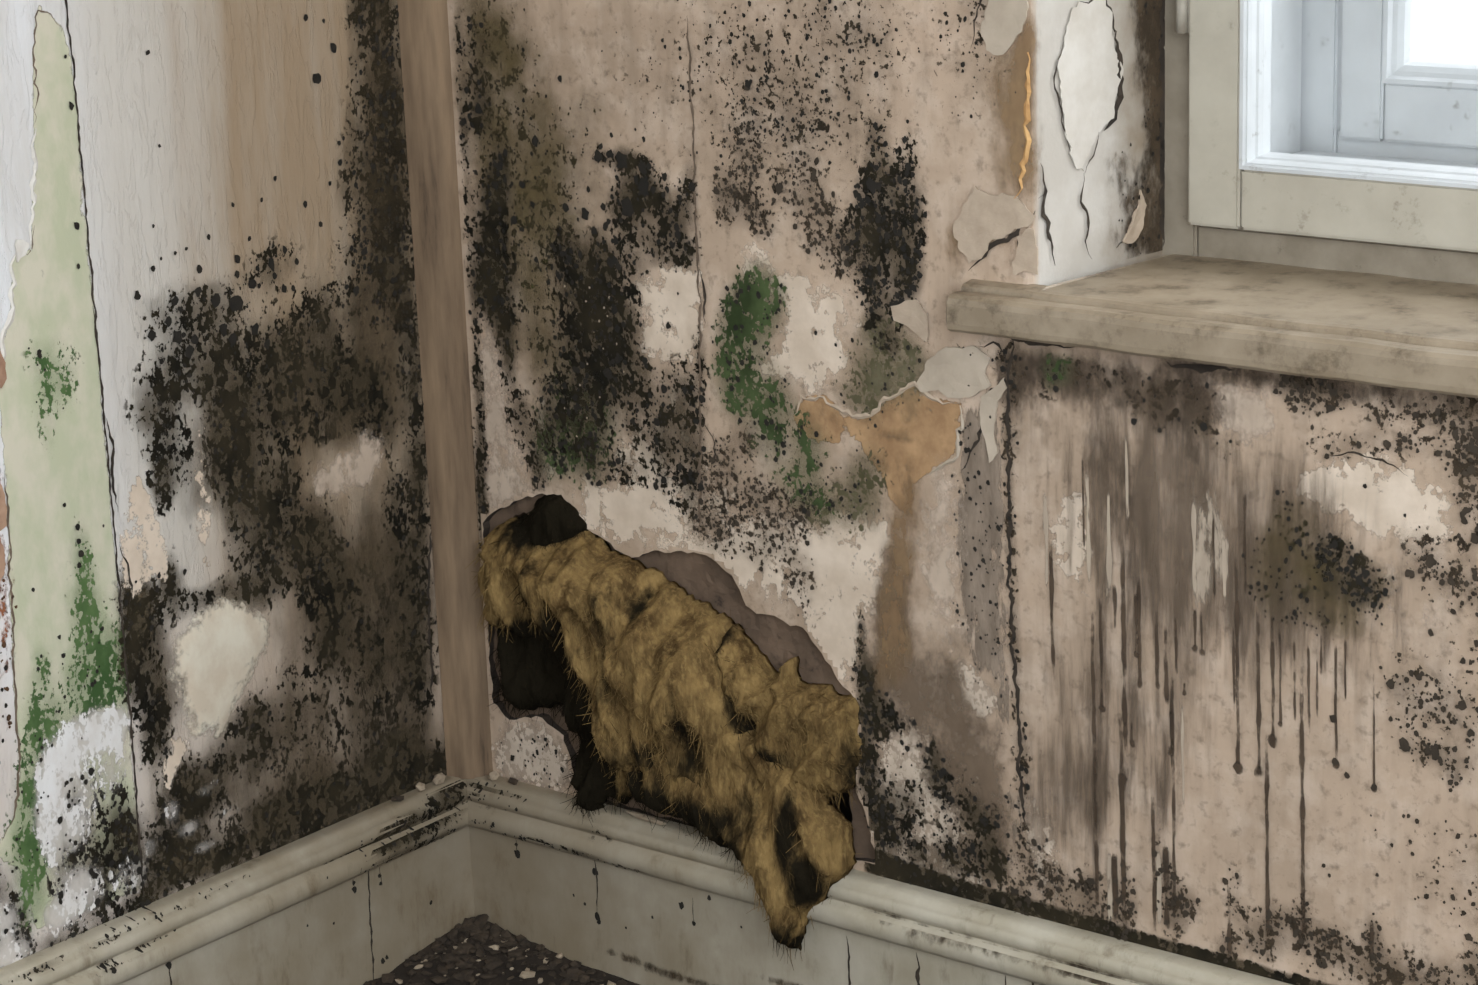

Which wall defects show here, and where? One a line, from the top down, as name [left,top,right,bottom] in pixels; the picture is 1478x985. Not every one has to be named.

peeling [0,5,168,929]
water stain [0,0,640,985]
flaking render [491,627,580,791]
water stain [455,0,1010,616]
flaking render [599,242,1007,695]
peeling [952,0,1038,275]
crack [1039,135,1099,264]
peeling [1053,0,1124,171]
water stain [851,342,1478,985]